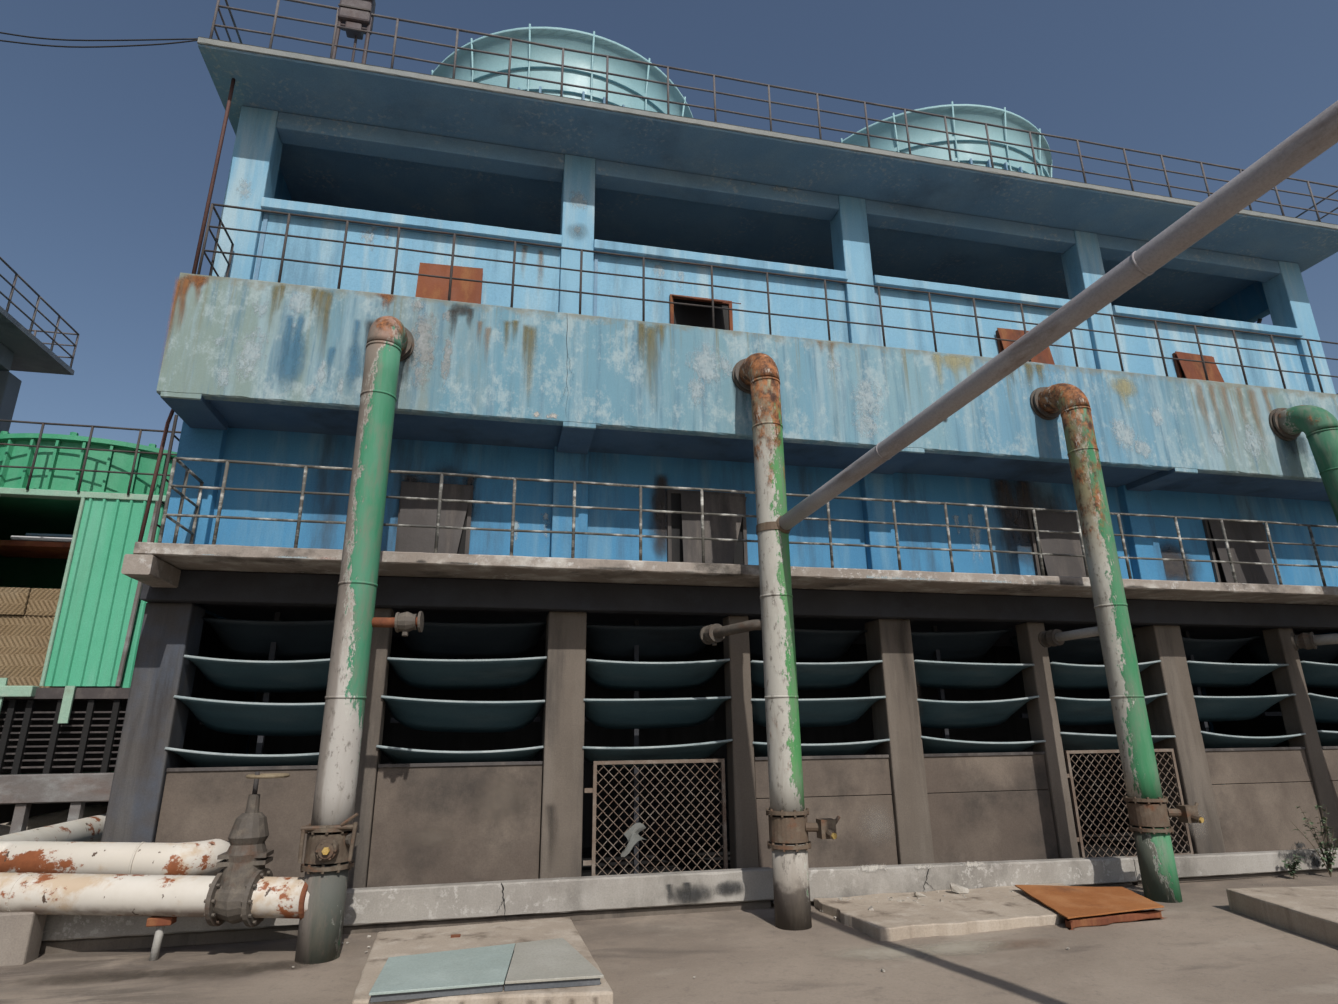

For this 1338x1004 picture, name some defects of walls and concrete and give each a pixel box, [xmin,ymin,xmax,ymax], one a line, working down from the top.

rust [170,275,207,326]
water stain [312,289,332,321]
water stain [280,316,304,379]